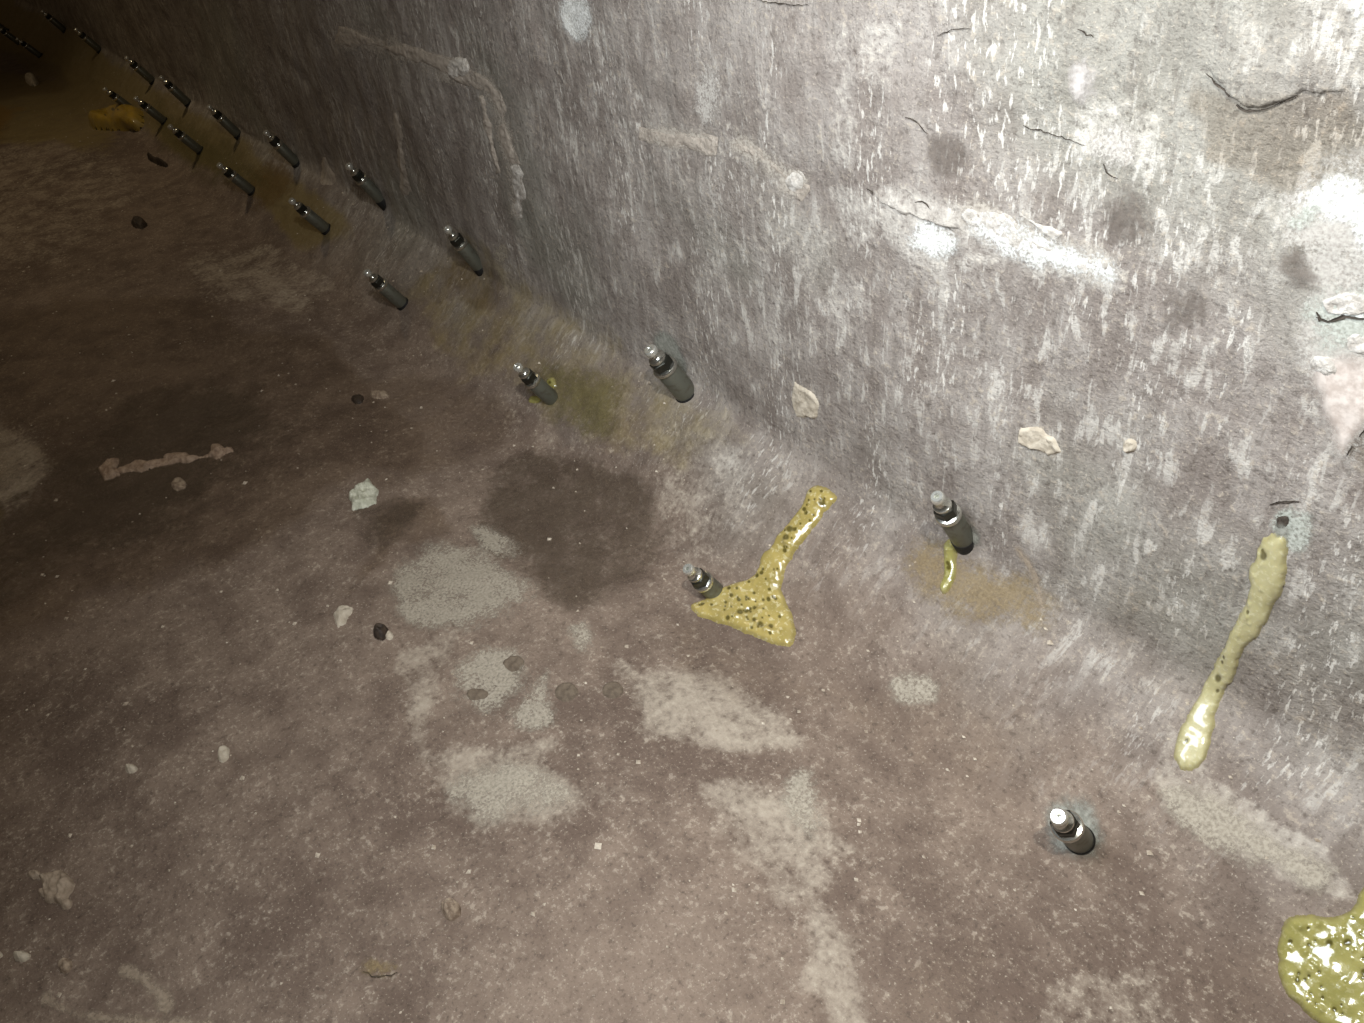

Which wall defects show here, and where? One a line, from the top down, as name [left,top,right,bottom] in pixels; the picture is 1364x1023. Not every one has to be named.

crack [866,188,951,230]
crack [1316,312,1364,323]
damp [393,457,649,629]